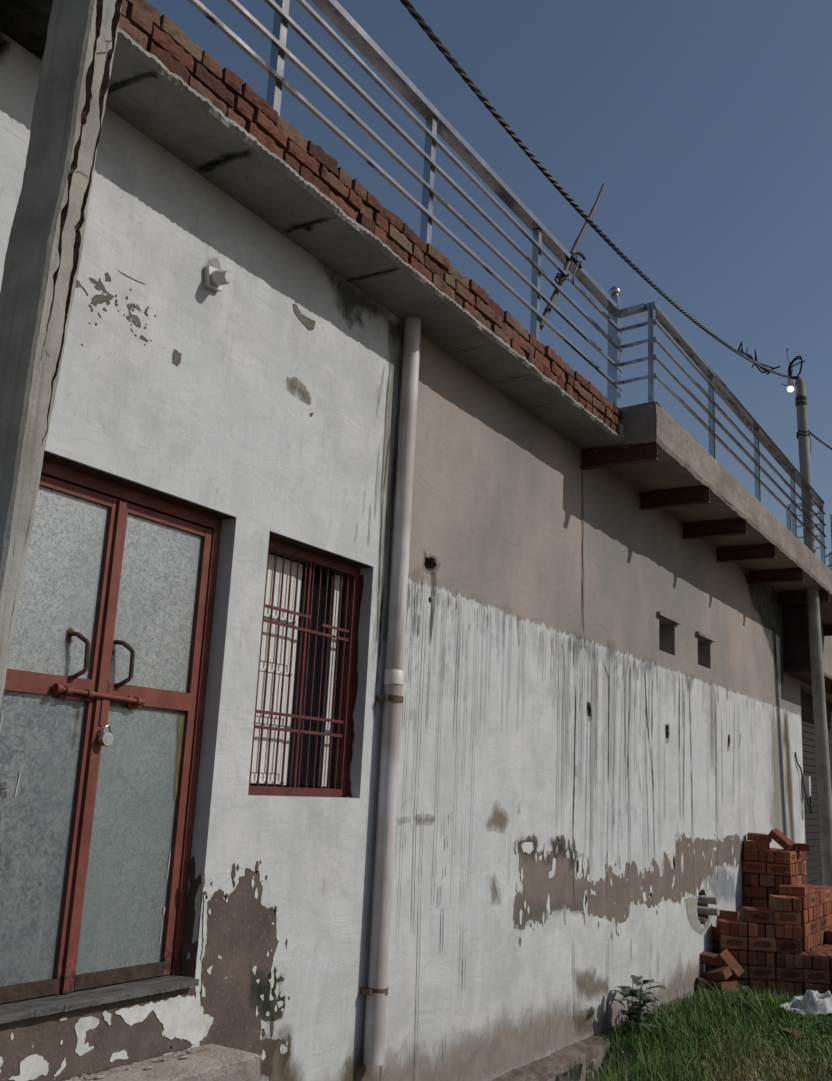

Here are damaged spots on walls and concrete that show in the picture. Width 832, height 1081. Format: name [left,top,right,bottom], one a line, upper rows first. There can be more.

crack [41,0,123,442]
peeling [76,272,156,345]
peeling [293,304,315,330]
leakage [744,570,784,683]
leakage [395,571,661,970]
leakage [673,671,692,762]
leakage [764,703,787,836]
peeling [513,833,746,946]
peeling [0,856,291,1081]
leakage [345,956,705,1081]